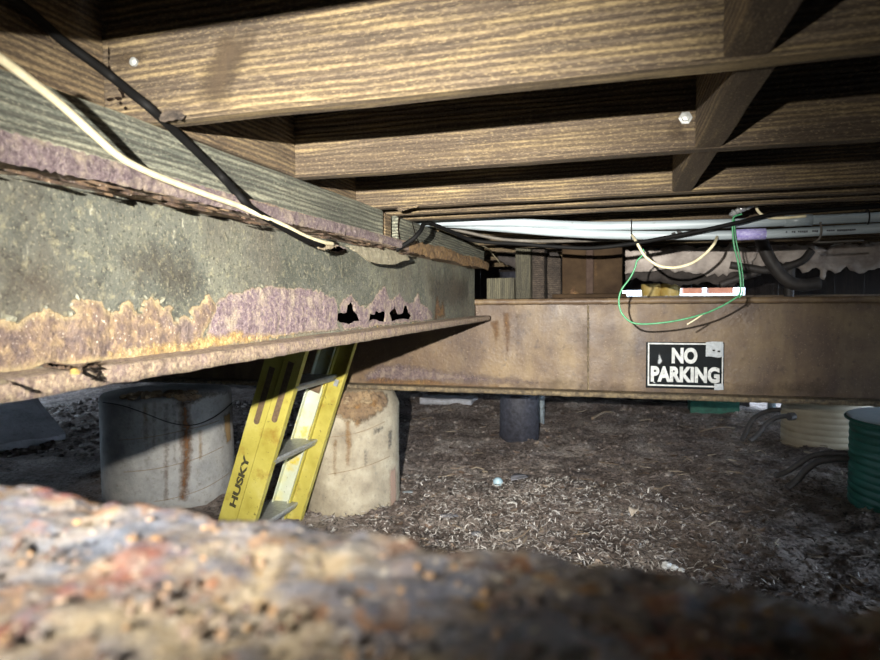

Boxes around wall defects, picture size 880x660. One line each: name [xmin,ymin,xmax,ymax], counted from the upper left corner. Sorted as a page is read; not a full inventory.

corrosion [108,331,285,358]
corrosion [179,404,192,499]